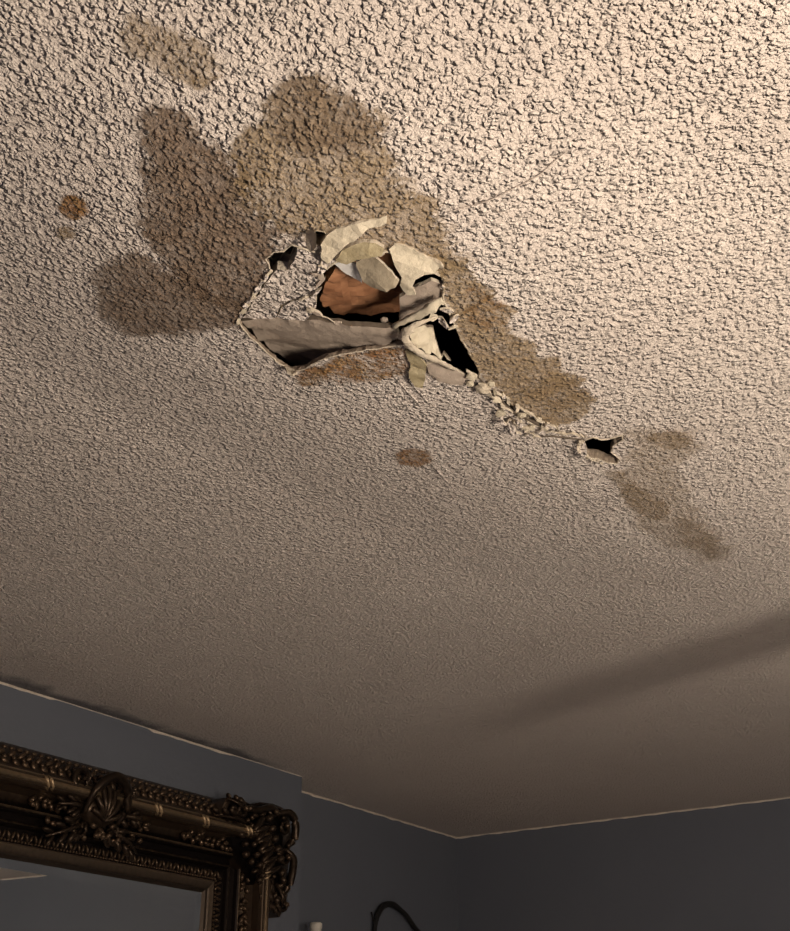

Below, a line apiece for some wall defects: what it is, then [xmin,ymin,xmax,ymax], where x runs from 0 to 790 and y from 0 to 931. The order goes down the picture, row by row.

peeling [236,269,273,325]
water stain [93,77,597,426]
peeling [299,239,447,301]
peeling [429,306,459,330]
crack [466,369,585,440]